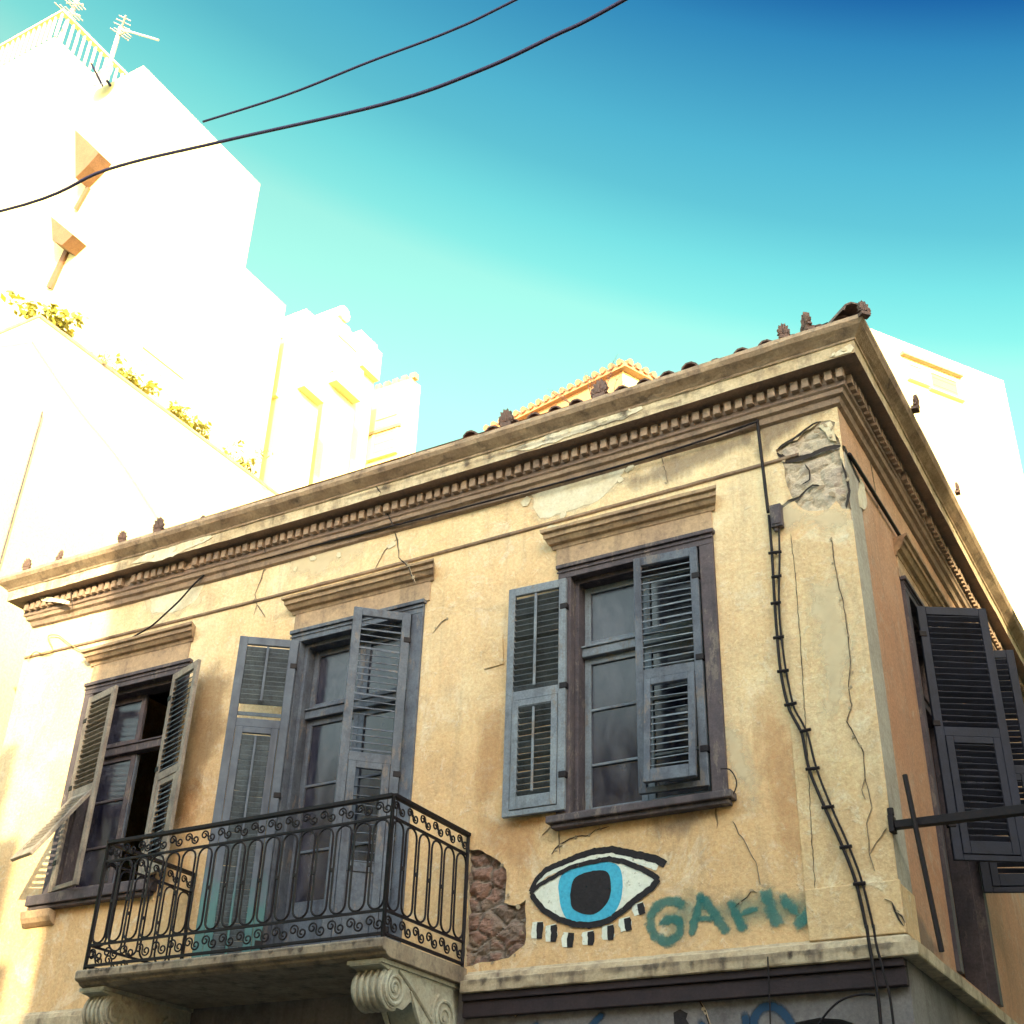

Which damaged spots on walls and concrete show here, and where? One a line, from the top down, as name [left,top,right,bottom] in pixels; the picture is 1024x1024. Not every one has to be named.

crack [373,486,415,582]
peeling [520,465,634,528]
spalling [777,421,851,526]
crack [791,539,815,887]
crack [829,537,887,871]
spalling [466,851,526,966]
crack [542,826,609,853]
crack [733,822,760,905]